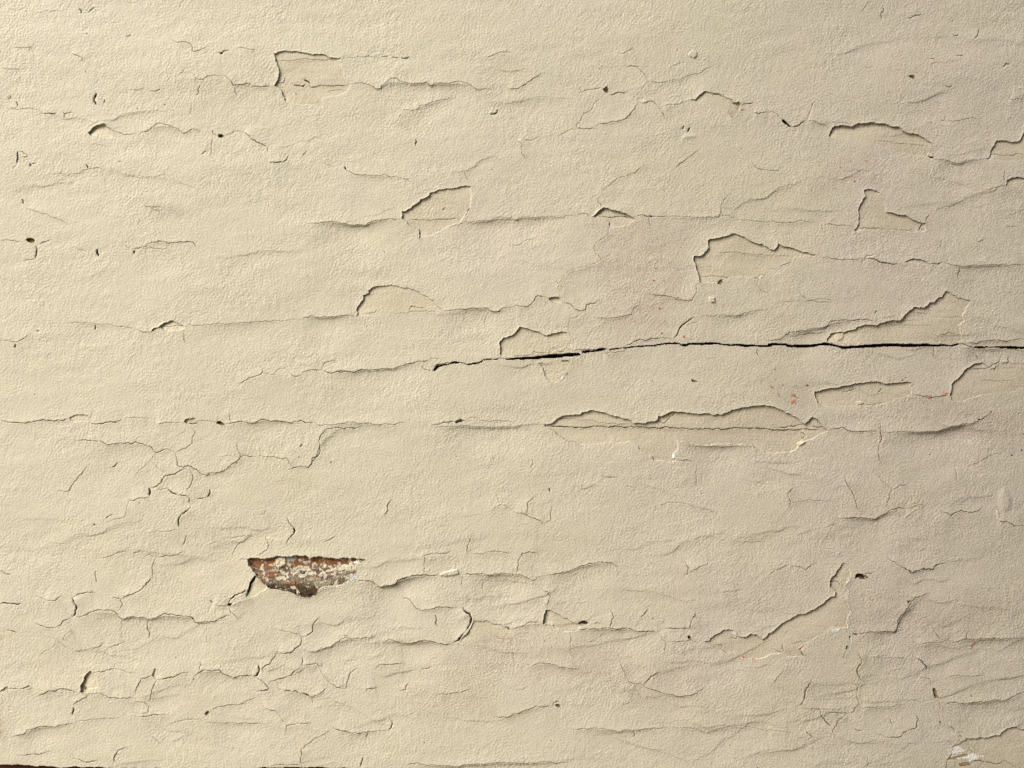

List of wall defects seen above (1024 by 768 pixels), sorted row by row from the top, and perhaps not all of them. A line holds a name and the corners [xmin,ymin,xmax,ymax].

peeling [400,184,472,240]
peeling [692,232,817,285]
peeling [826,290,972,345]
crack [239,340,1024,384]
peeling [543,380,912,463]
spalling [245,555,366,598]
crack [0,417,616,766]
crack [499,610,696,718]